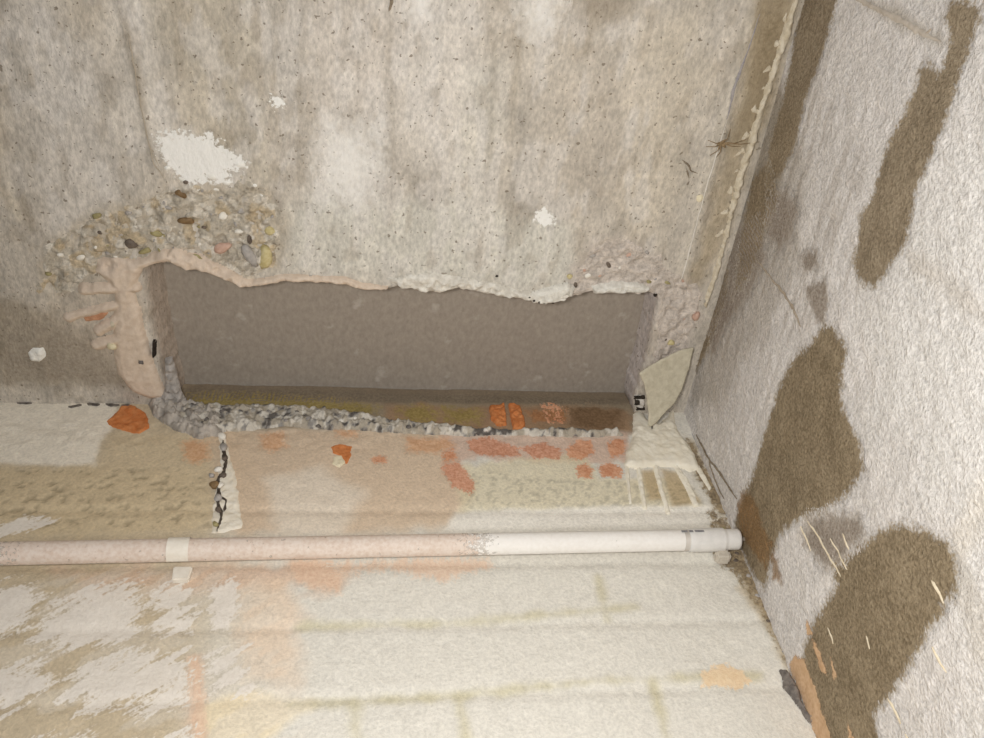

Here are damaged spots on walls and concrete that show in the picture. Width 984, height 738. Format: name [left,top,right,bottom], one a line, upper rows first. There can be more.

damp [849,0,984,294]
spalling [36,176,285,295]
flaking render [84,312,108,321]
flaking render [107,405,149,434]
spalling [387,238,702,430]
corrosion [522,402,626,431]
damp [695,0,962,738]
crack [209,432,243,533]